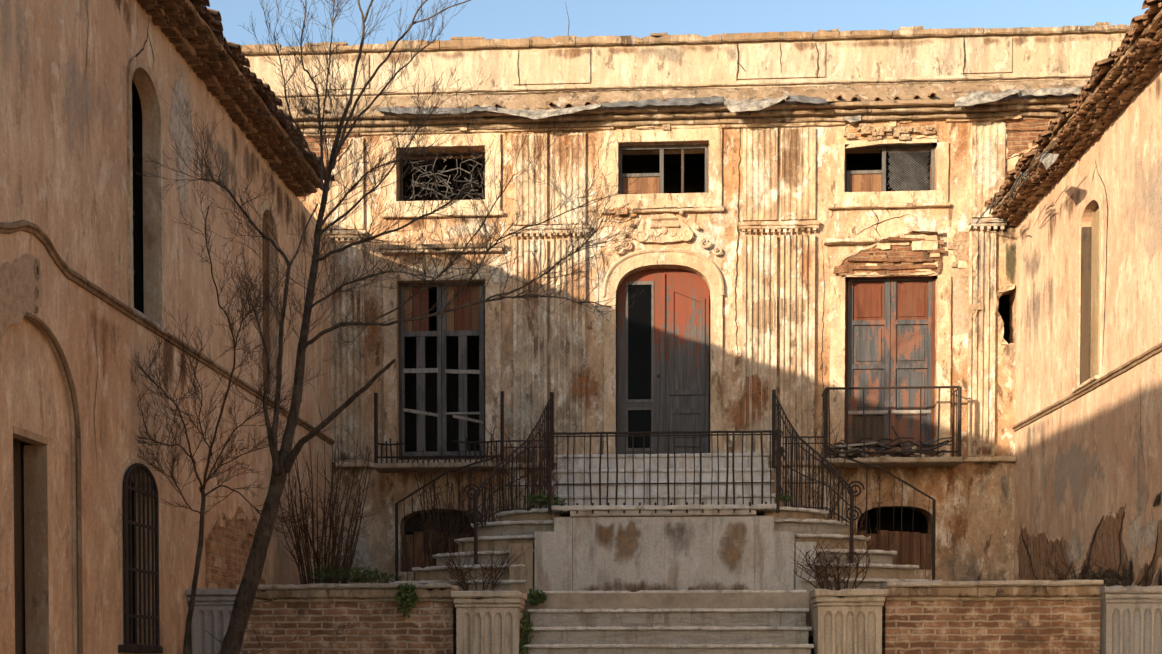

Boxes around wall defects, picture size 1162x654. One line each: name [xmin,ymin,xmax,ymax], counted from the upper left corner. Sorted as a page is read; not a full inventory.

flaking render [0,253,43,341]
flaking render [833,225,1015,330]
flaking render [205,506,258,589]
flaking render [1017,505,1162,587]